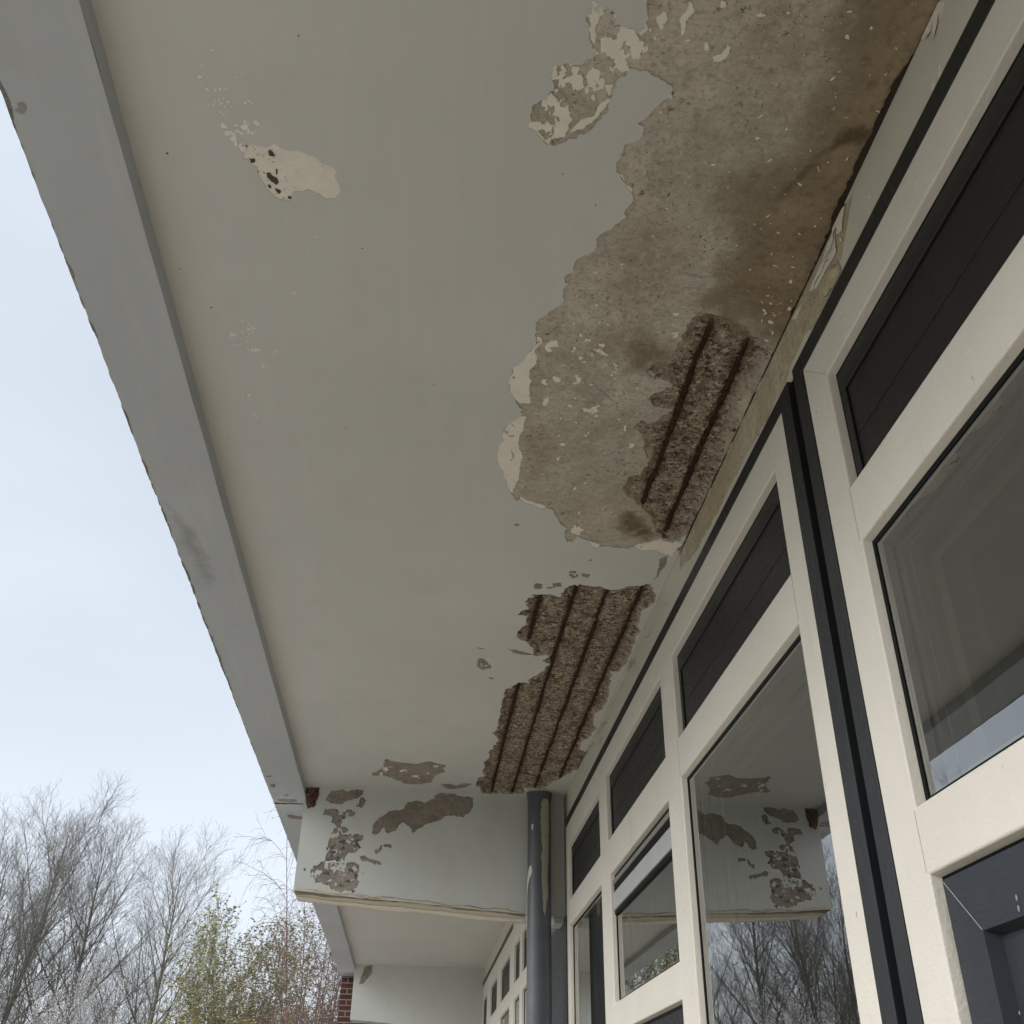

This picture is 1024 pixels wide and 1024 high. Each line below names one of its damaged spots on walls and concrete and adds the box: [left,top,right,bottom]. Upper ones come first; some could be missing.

peeling [921,1,944,40]
peeling [243,144,340,200]
peeling [294,0,873,924]